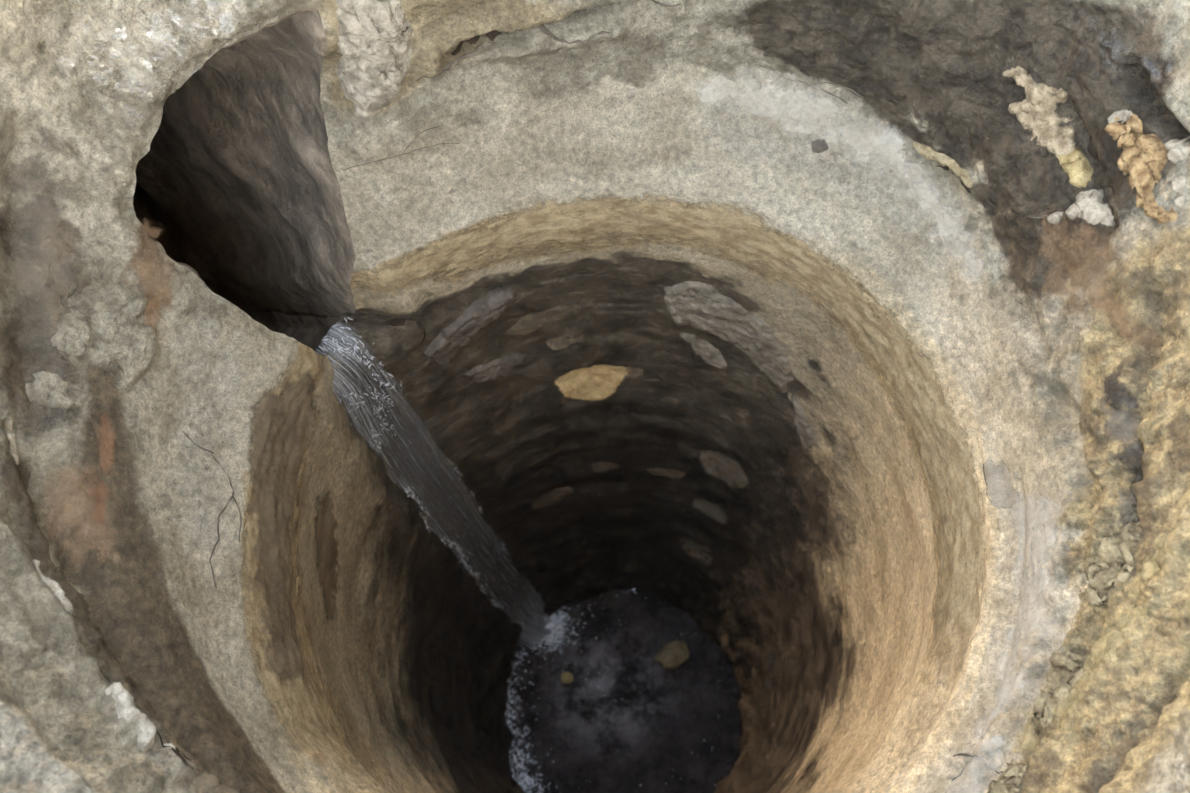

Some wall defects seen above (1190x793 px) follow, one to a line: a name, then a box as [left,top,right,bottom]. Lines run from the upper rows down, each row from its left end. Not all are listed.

corrosion [125,224,173,332]
crack [184,432,242,588]